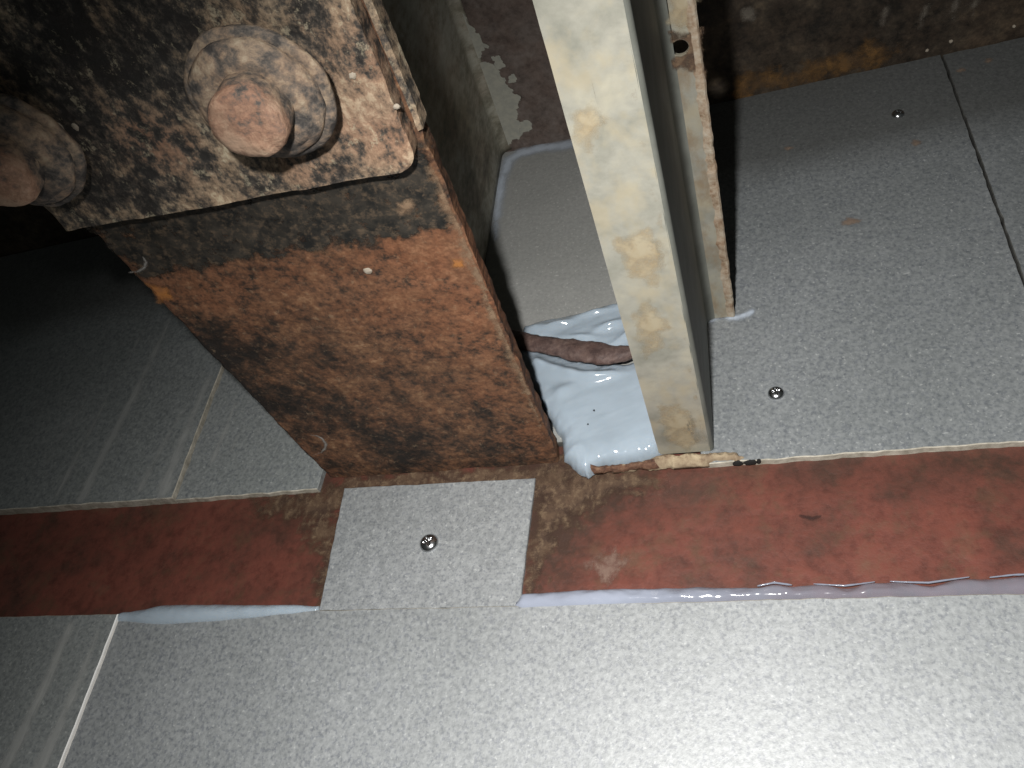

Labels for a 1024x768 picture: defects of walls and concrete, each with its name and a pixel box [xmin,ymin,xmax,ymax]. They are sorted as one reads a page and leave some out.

rust [364,0,427,131]
peeling [462,13,532,146]
rust [397,200,413,215]
rust [668,0,735,317]
rust [150,285,172,302]
rust [432,170,632,417]